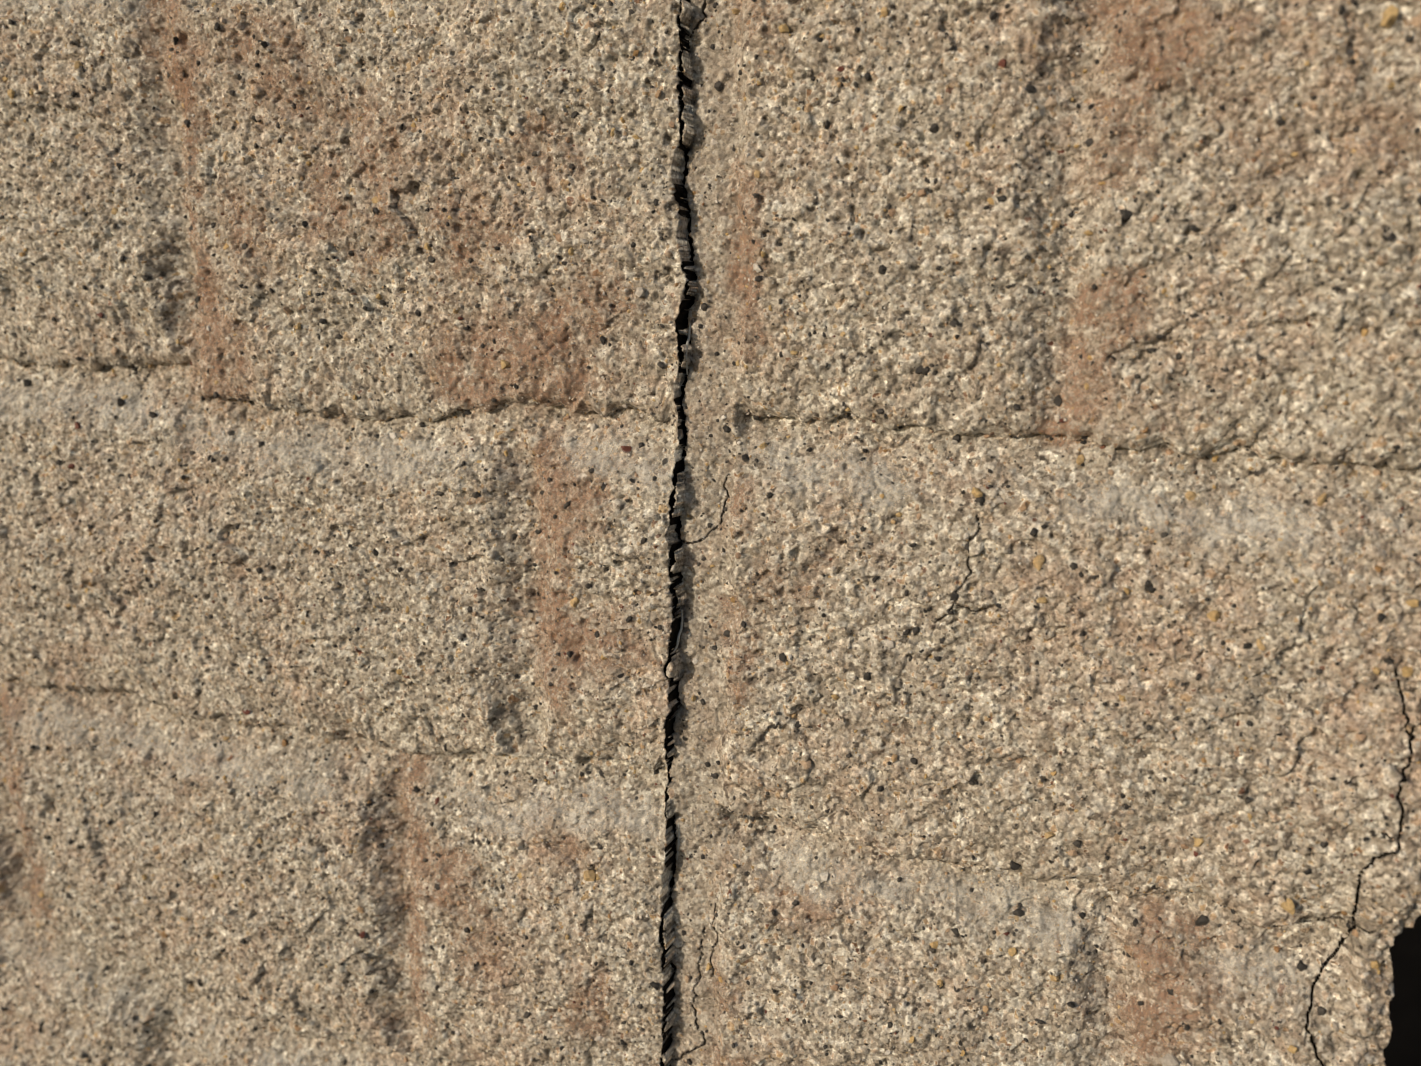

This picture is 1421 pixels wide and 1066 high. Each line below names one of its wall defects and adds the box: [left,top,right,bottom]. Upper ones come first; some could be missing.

crack [659,0,730,1066]
crack [1304,669,1421,1066]